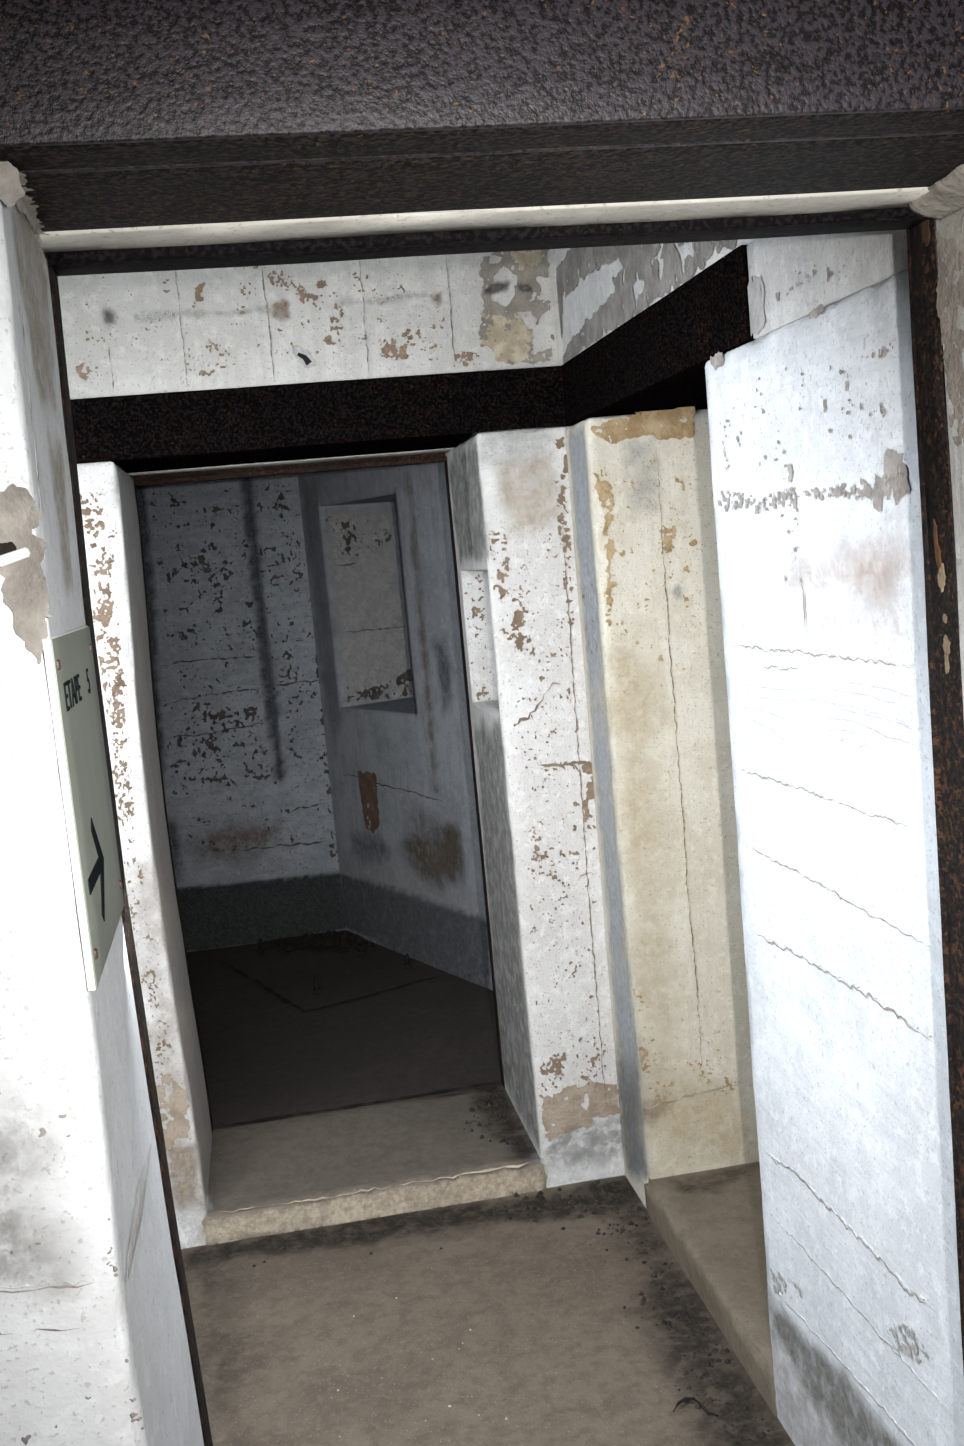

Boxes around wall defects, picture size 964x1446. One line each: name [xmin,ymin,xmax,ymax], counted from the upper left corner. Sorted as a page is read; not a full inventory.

peeling [231,240,736,370]
peeling [921,220,964,446]
peeling [591,406,696,444]
peeling [717,377,910,560]
spalling [0,484,52,664]
peeling [80,492,154,941]
crack [745,772,924,834]
leakage [168,728,659,1214]
crack [754,849,929,947]
crack [757,935,935,1044]
peeling [539,995,620,1142]
leakage [773,1311,897,1446]